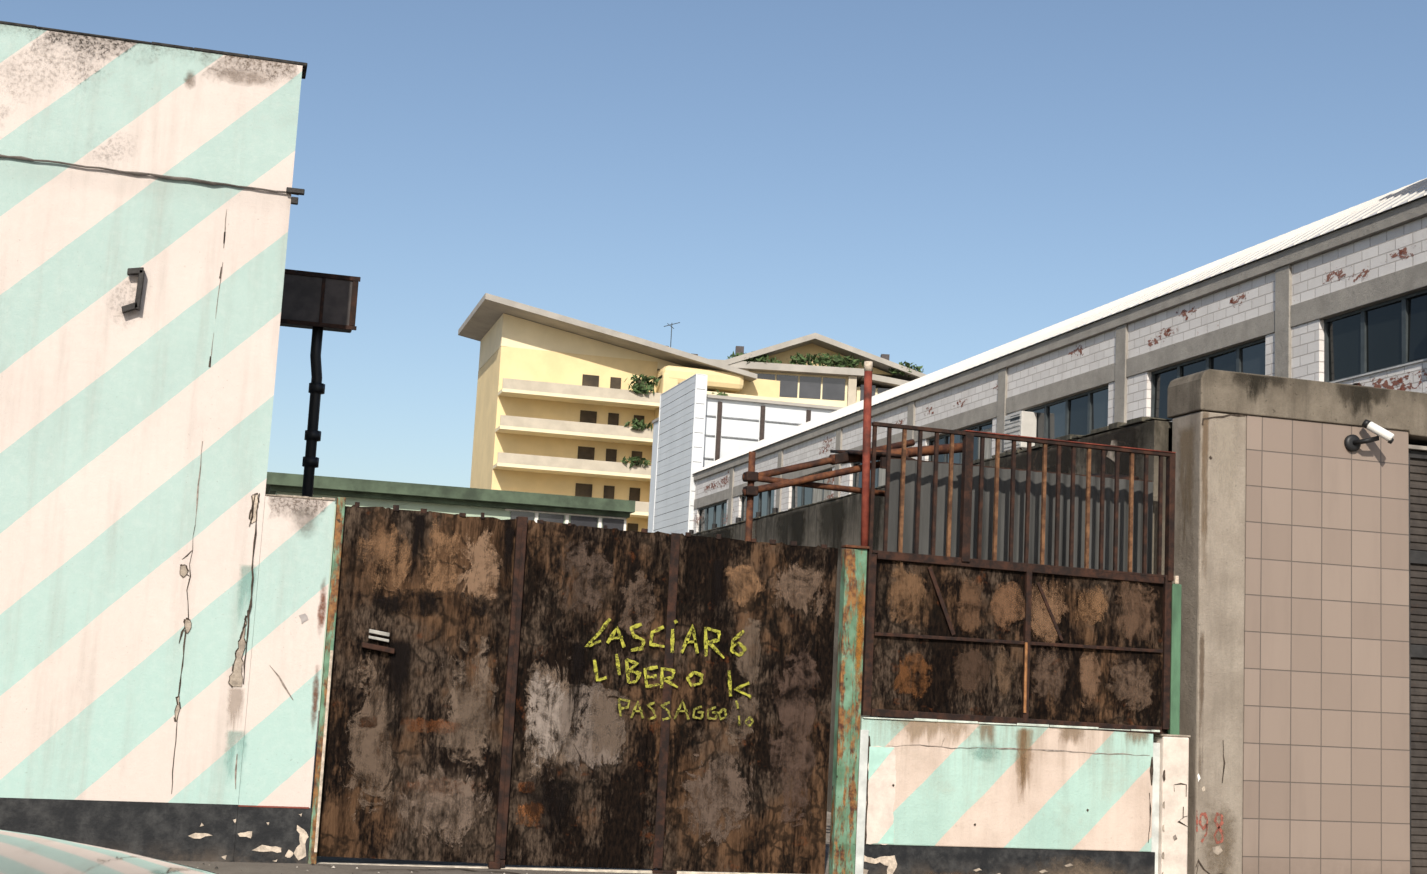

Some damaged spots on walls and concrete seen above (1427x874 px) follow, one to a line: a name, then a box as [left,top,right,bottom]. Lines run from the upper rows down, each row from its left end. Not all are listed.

water stain [45,32,136,55]
water stain [218,55,293,83]
peeling [1323,245,1416,284]
water stain [1234,373,1285,397]
water stain [1339,385,1387,412]
peeling [1358,369,1427,391]
spalling [1106,439,1126,463]
crack [171,441,203,794]
rust [855,589,863,679]
spalling [228,610,248,718]
spalling [233,814,308,862]